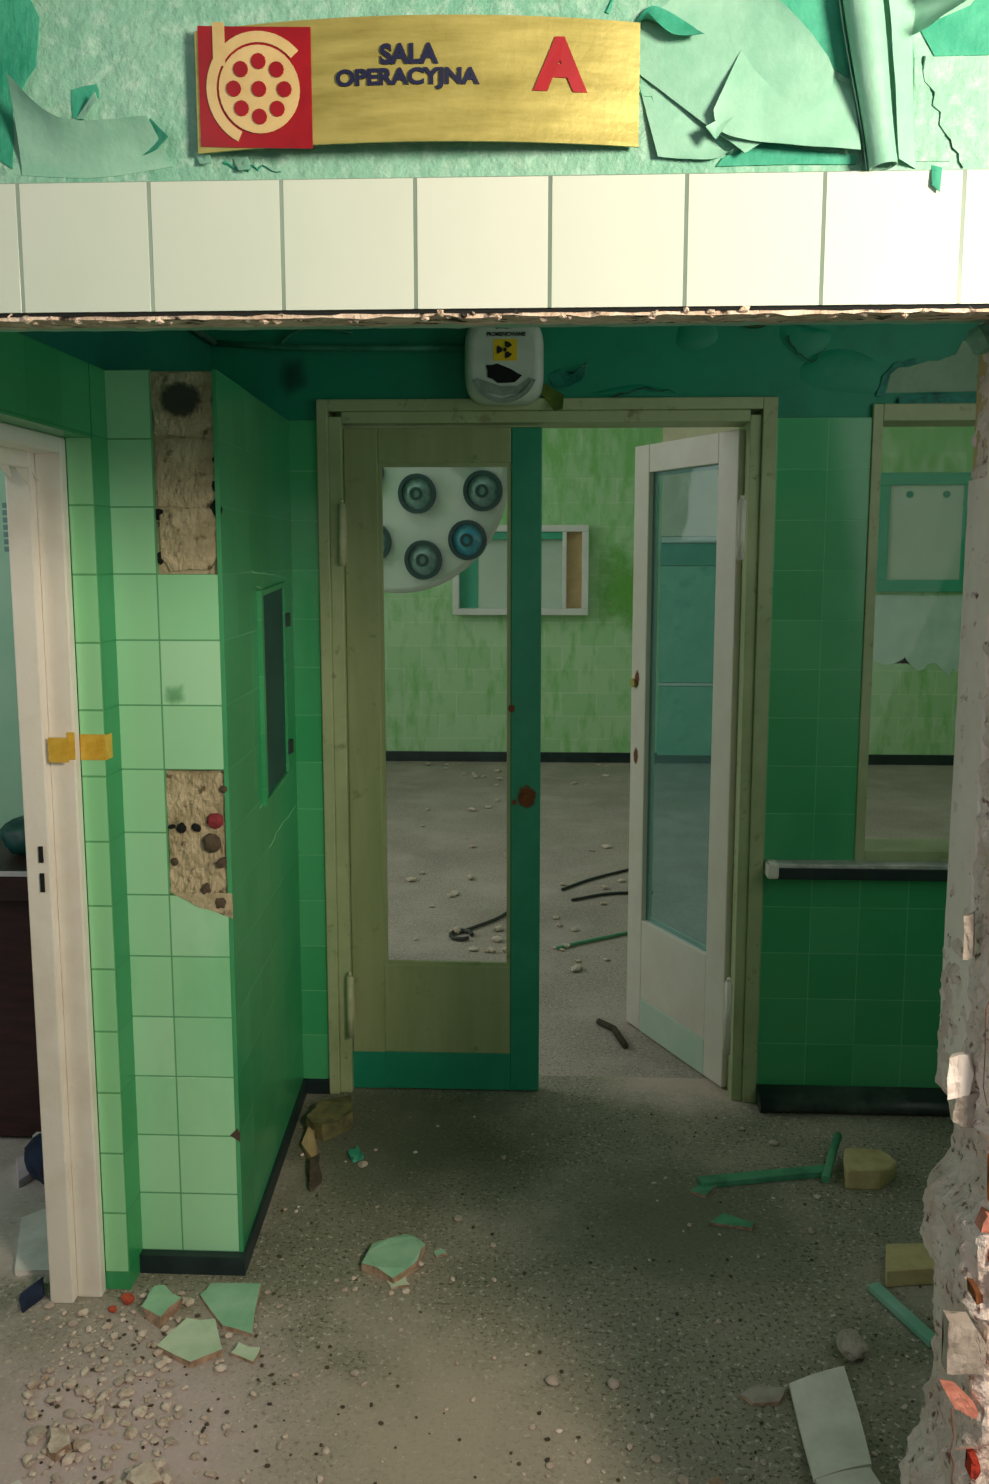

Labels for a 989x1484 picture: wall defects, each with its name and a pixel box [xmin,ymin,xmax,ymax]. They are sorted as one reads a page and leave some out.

peeling [0,0,173,178]
peeling [636,0,989,192]
damp [604,561,633,623]
spalling [0,304,989,1128]
spalling [974,1153,989,1233]
spalling [939,1277,989,1484]